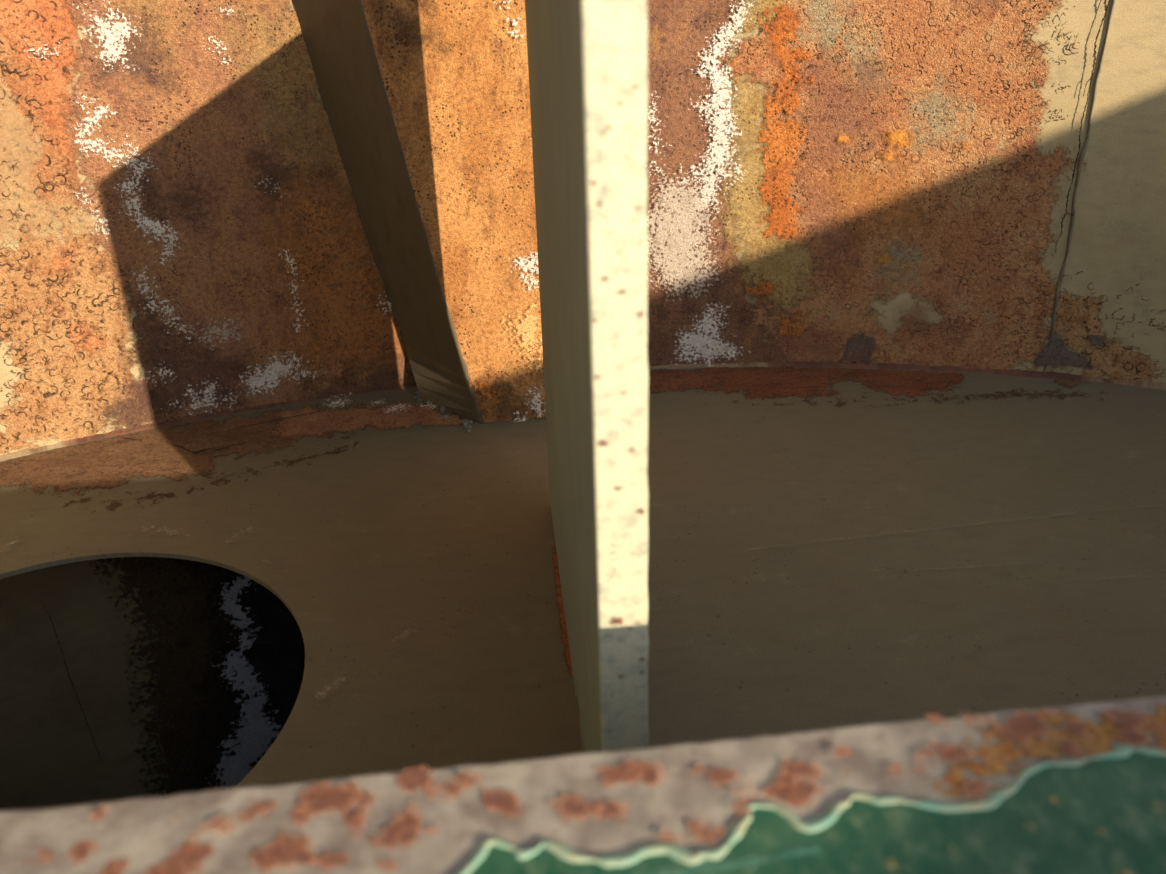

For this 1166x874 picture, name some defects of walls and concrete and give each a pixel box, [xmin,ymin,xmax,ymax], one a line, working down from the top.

leakage [25,0,144,74]
crack [1055,0,1110,253]
leakage [66,85,249,351]
rust [0,0,546,512]
leakage [278,248,309,333]
leakage [647,0,759,367]
rust [634,0,1164,408]
leakage [135,351,326,415]
peeling [1035,333,1105,370]
rust [145,800,277,874]
rust [250,766,521,874]
rust [551,760,664,823]